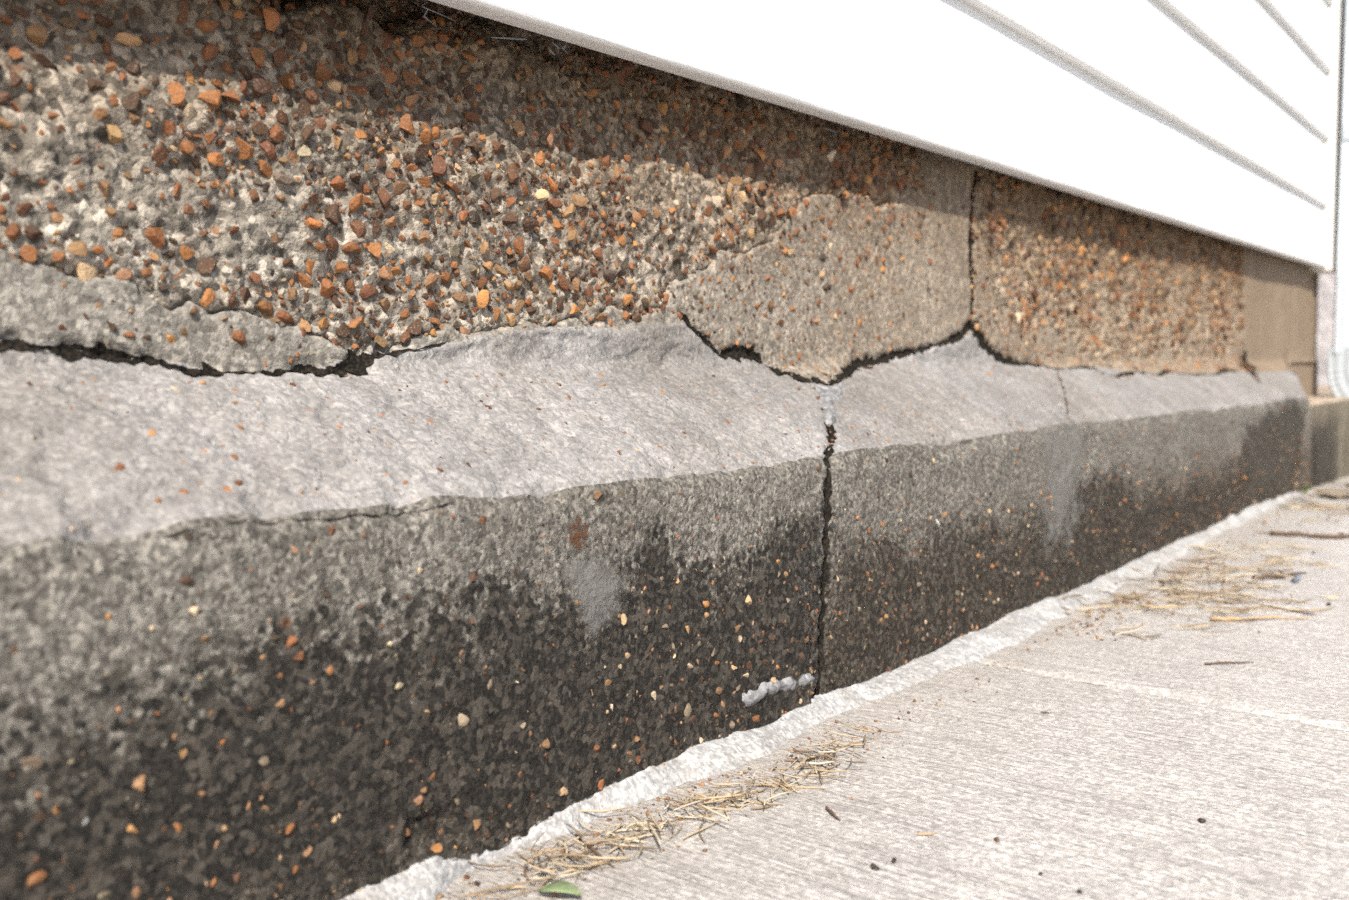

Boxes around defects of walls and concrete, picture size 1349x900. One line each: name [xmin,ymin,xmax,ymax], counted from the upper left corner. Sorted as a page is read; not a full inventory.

crack [0,339,447,377]
spalling [0,0,926,354]
crack [679,171,1300,418]
leakage [818,398,1339,692]
leakage [0,503,827,900]